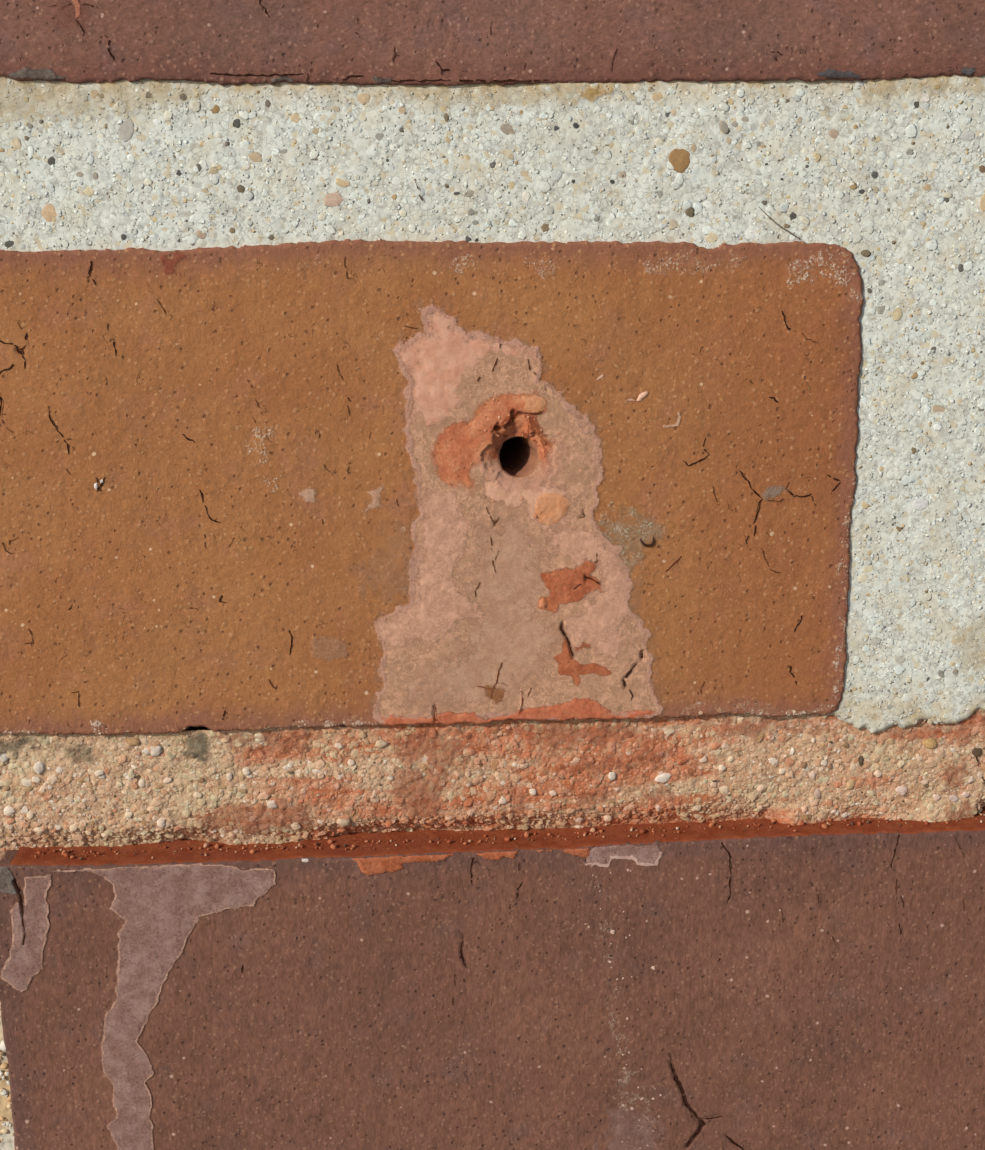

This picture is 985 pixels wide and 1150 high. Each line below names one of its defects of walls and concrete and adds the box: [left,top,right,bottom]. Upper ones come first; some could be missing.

crack [49,3,115,61]
peeling [496,395,546,431]
crack [683,438,719,505]
peeling [535,493,569,525]
crack [739,470,840,573]
spalling [0,867,21,895]
crack [669,1053,743,1150]